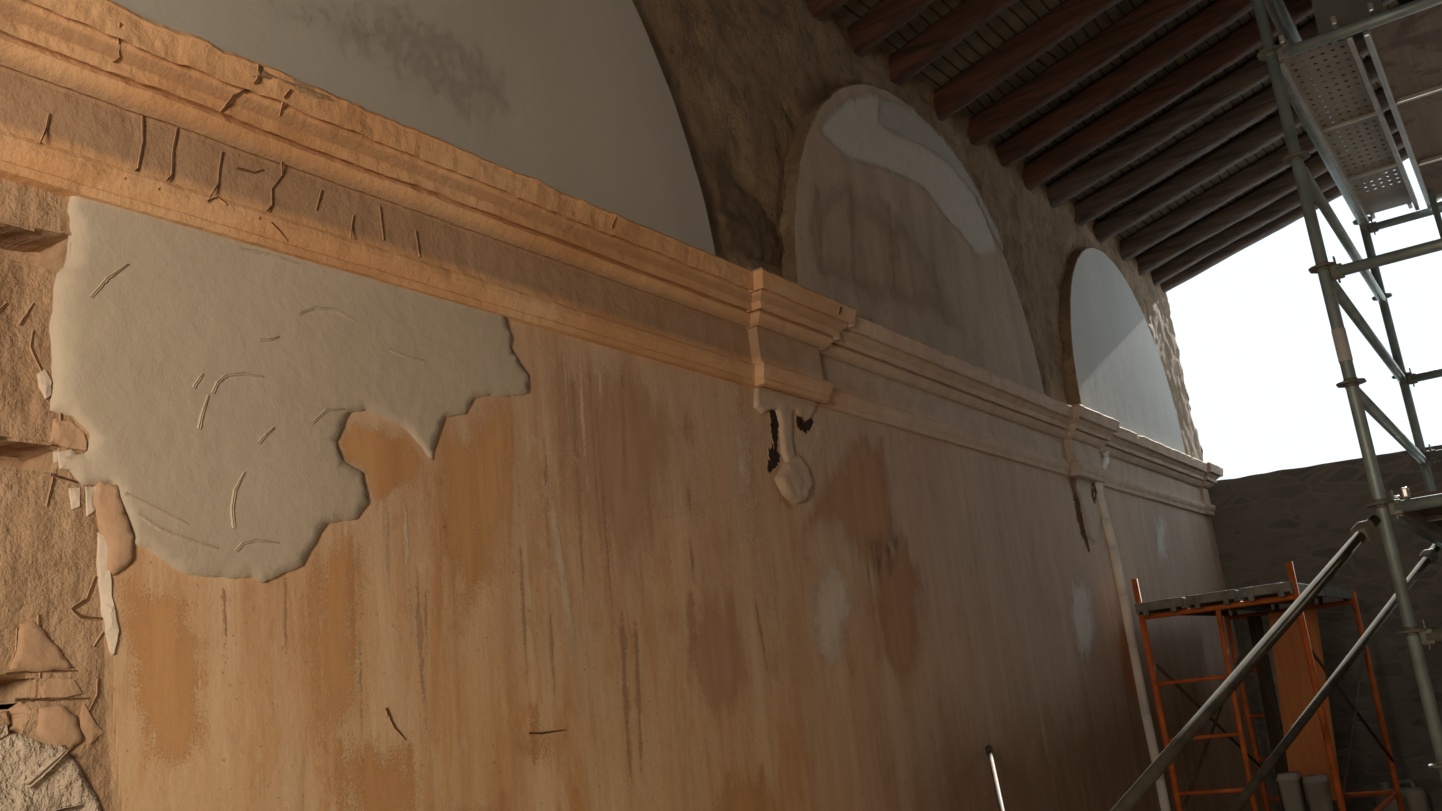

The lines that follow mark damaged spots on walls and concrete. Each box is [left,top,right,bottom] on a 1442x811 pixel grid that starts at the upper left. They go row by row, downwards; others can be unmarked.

crack [220,64,292,116]
crack [124,115,179,190]
crack [207,151,287,241]
crack [350,206,420,257]
crack [0,302,43,372]
flaking render [37,369,52,399]
flaking render [49,419,87,470]
flaking render [69,480,134,655]
water stain [541,348,645,807]
flaking render [0,620,104,751]